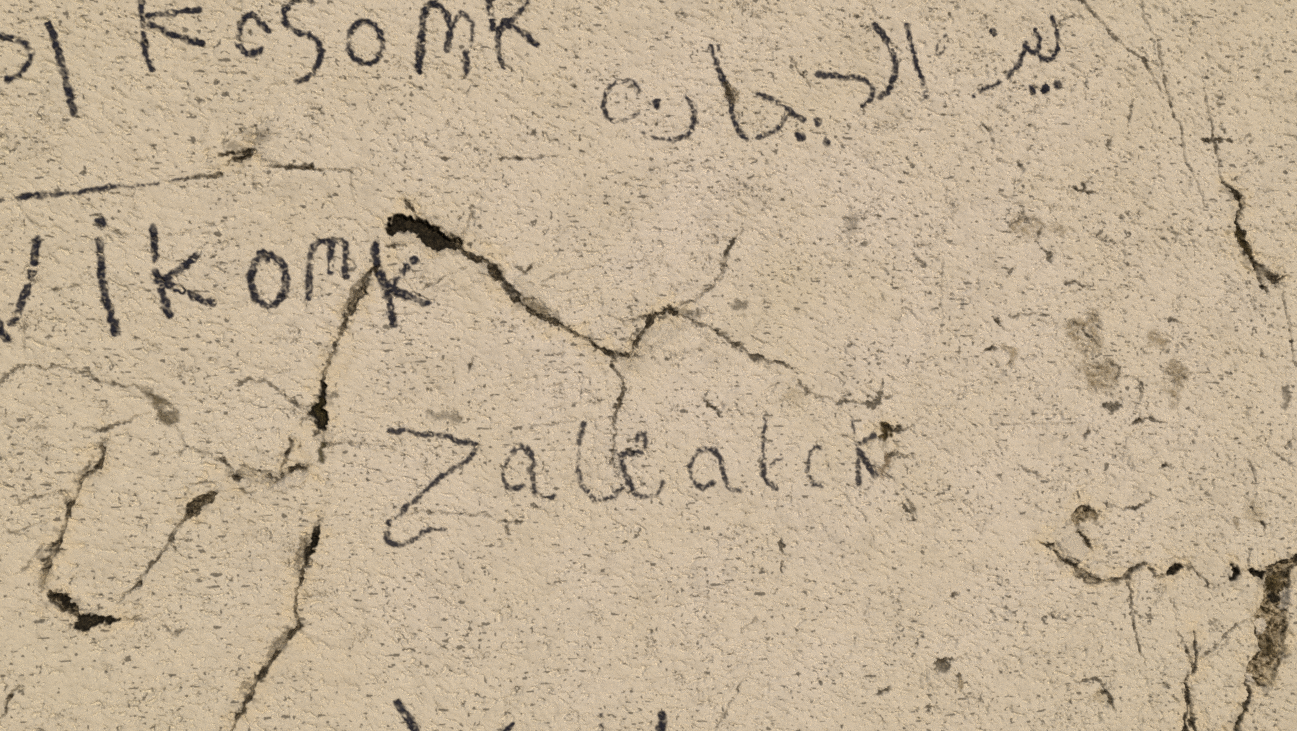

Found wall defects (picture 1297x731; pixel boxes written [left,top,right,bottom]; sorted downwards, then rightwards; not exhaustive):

crack [1078,0,1284,291]
crack [238,201,787,454]
crack [807,391,890,410]
crack [131,482,217,590]
crack [231,516,320,731]
crack [1042,542,1209,653]
crack [1168,641,1209,731]
crack [1234,681,1252,731]